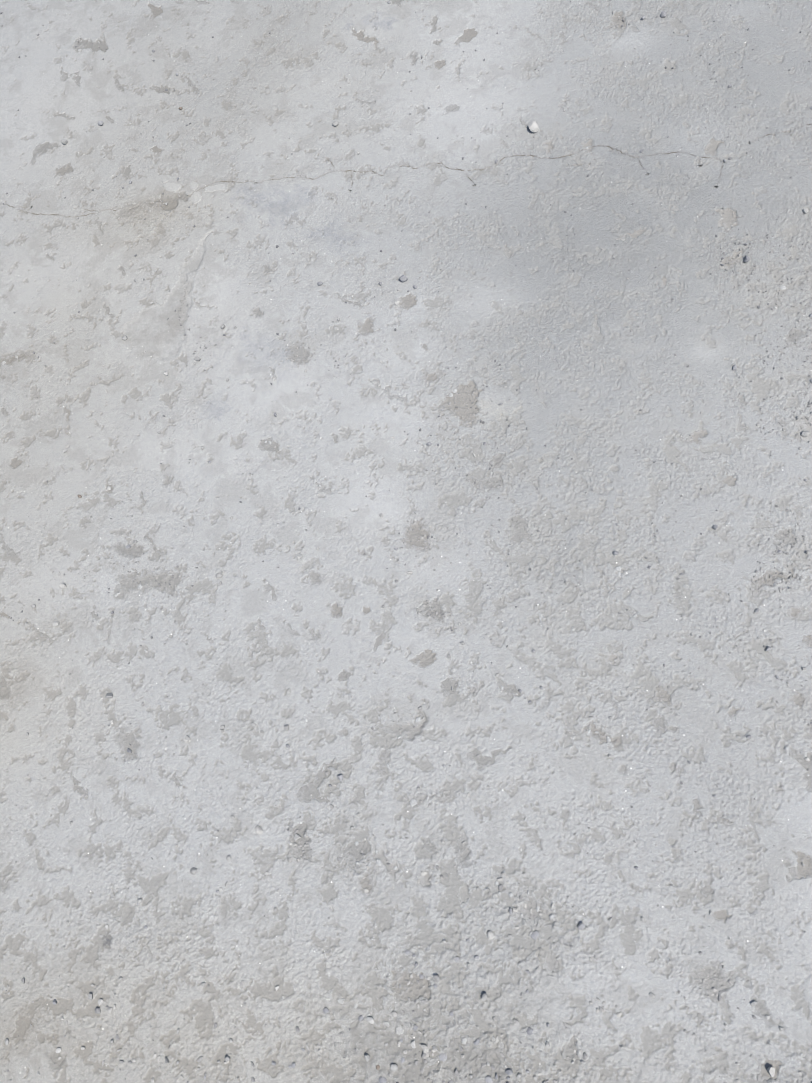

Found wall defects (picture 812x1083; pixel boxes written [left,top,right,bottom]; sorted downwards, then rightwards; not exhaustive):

crack [0,143,727,219]